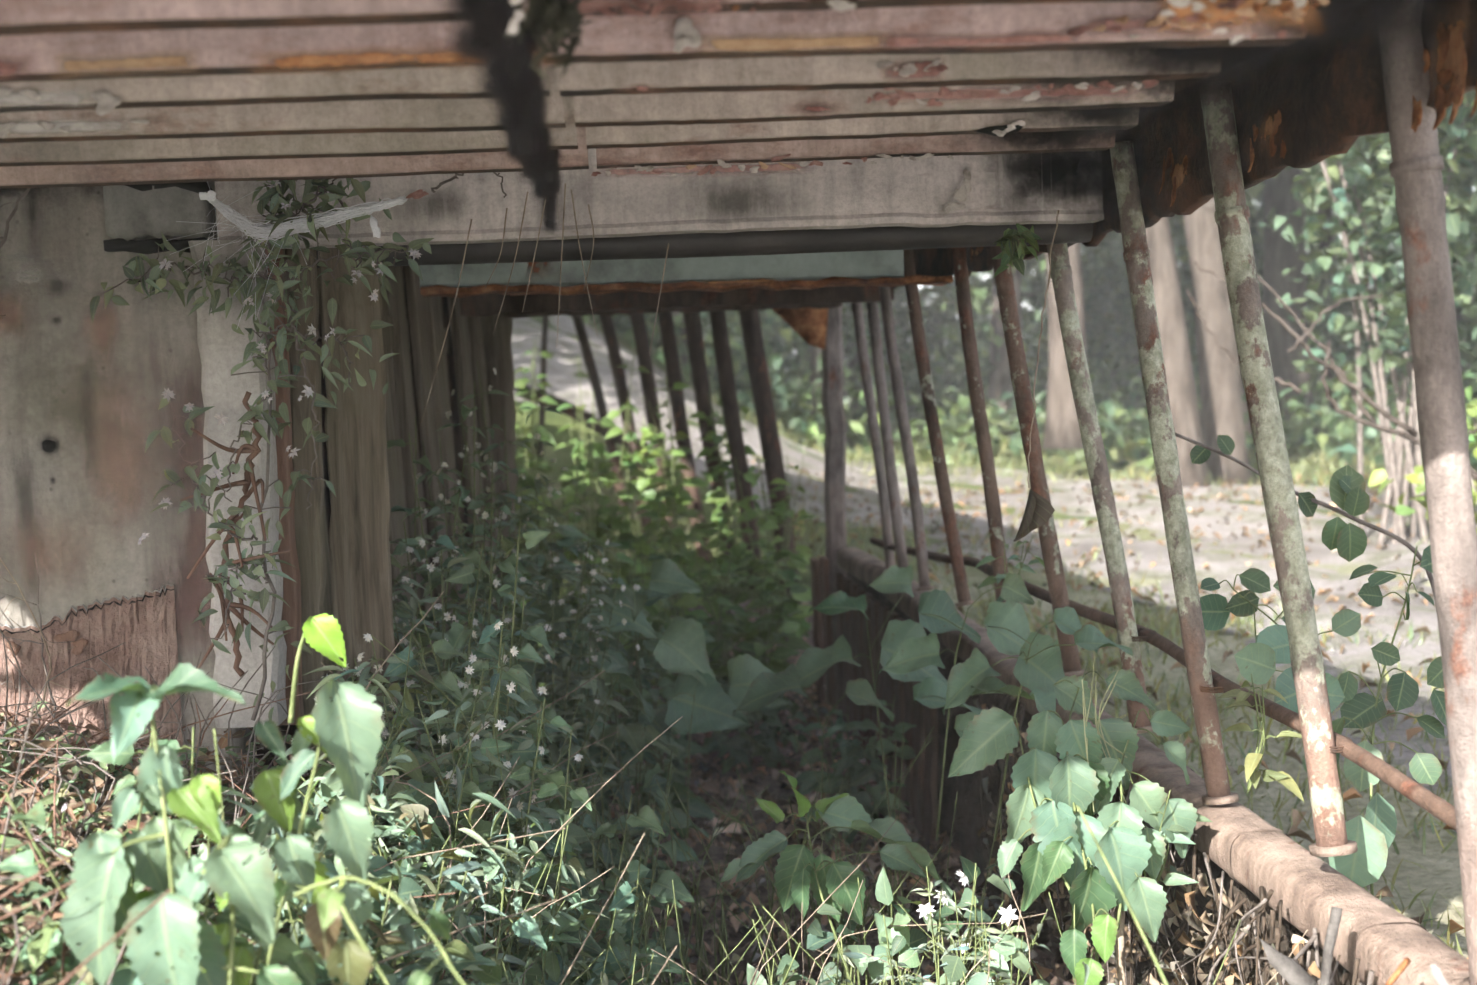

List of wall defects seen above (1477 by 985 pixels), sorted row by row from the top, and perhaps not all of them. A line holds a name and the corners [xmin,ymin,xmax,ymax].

peeling [1067,0,1329,44]
rust [1411,18,1477,132]
rust [1247,110,1286,173]
spalling [0,584,185,775]